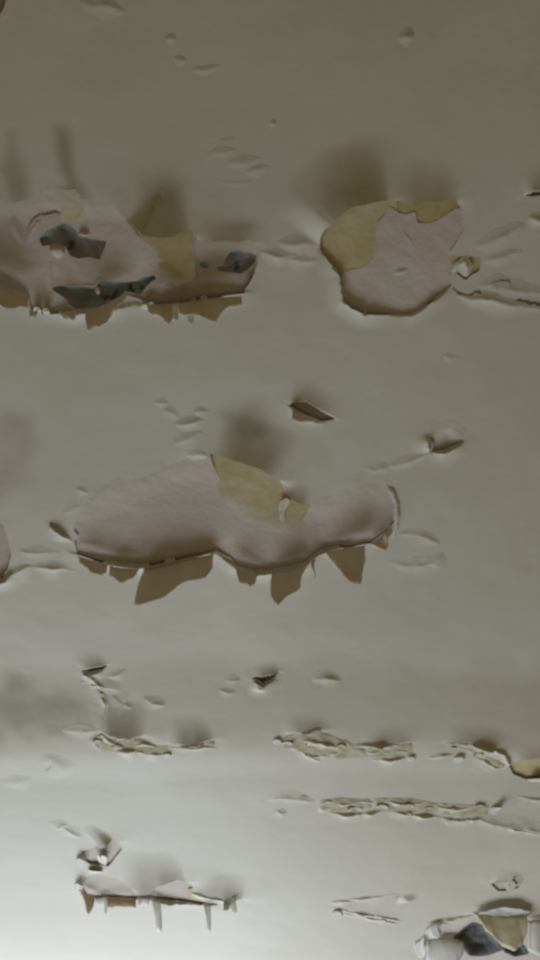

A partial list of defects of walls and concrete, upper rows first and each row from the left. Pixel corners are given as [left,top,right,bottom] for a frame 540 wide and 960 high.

peeling [0,178,275,332]
peeling [302,182,497,329]
peeling [284,398,341,426]
peeling [0,441,410,606]
peeling [249,670,284,689]
peeling [62,723,217,763]
peeling [273,728,540,782]
peeling [265,790,540,838]
peeling [68,834,246,932]
peeling [414,899,540,960]